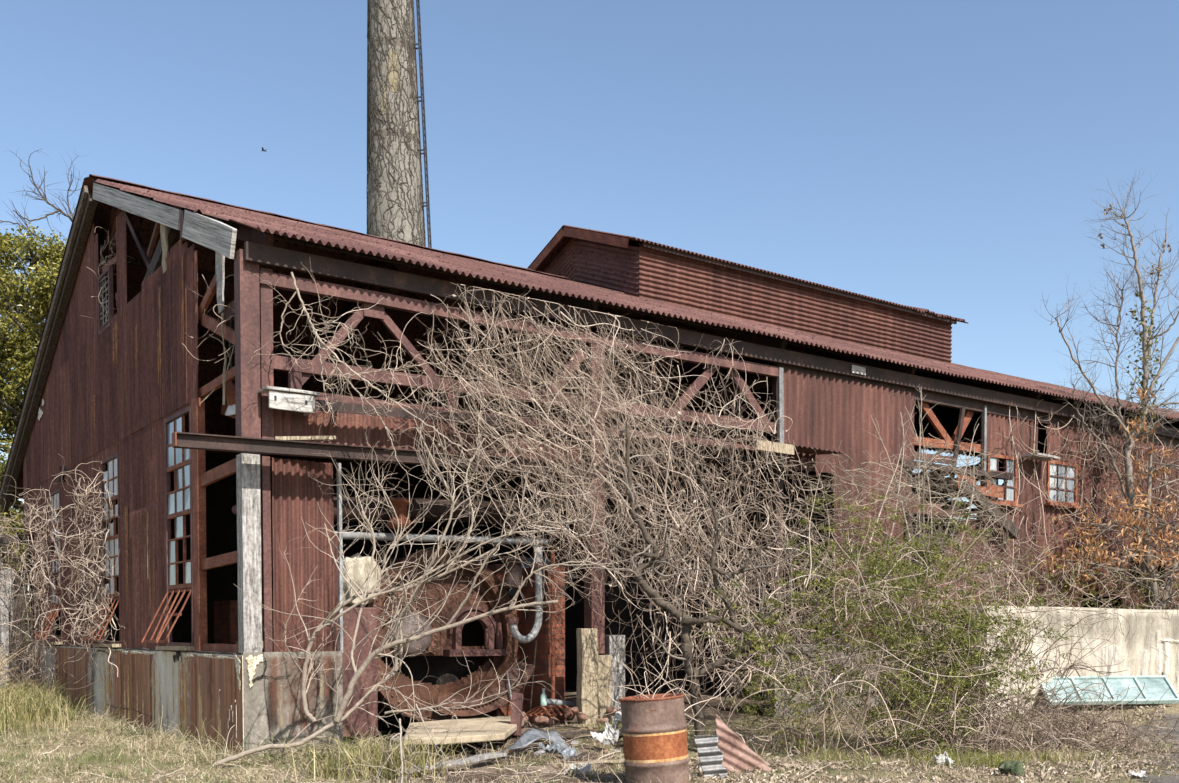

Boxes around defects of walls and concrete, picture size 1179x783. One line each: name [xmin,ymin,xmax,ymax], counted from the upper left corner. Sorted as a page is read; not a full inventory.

rust [34,647,242,755]
damp [268,682,283,728]
damp [320,660,334,721]